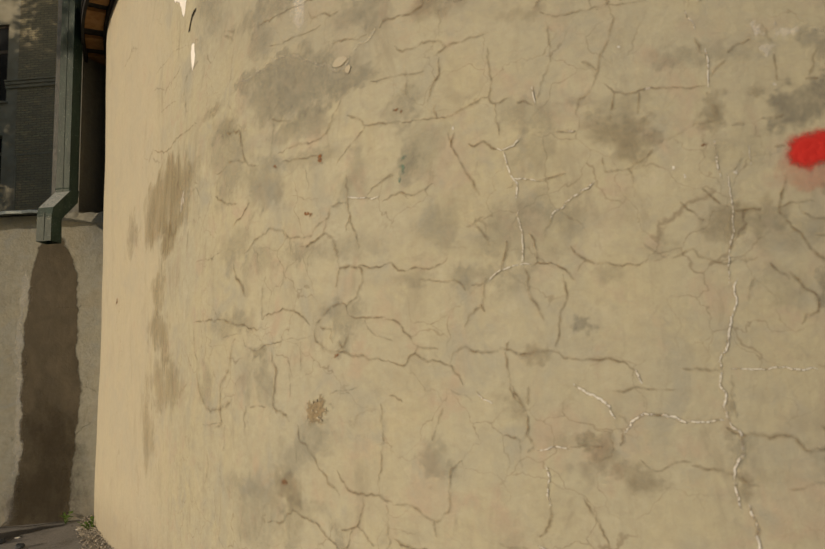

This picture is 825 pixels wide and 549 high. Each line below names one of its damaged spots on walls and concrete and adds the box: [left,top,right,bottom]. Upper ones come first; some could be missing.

crack [450,127,564,195]
crack [489,219,582,294]
crack [573,141,816,446]
water stain [0,238,82,542]
spalling [307,394,327,425]
crack [733,458,761,549]